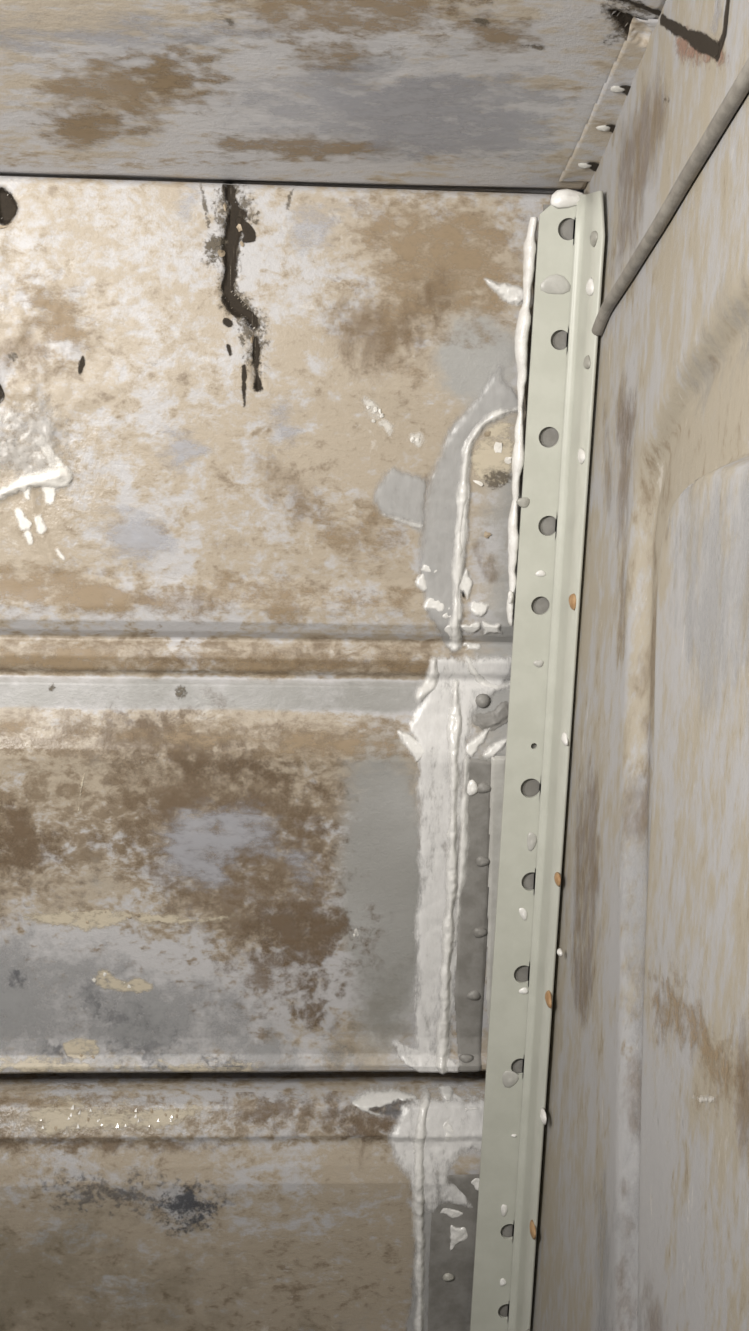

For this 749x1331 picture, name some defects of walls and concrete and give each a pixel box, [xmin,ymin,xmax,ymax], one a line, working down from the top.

crack [613,0,729,64]
water stain [245,71,554,154]
spalling [0,187,18,229]
crack [201,182,297,406]
water stain [35,436,66,467]
water stain [15,486,55,544]
water stain [165,810,270,882]
water stain [0,946,295,1074]